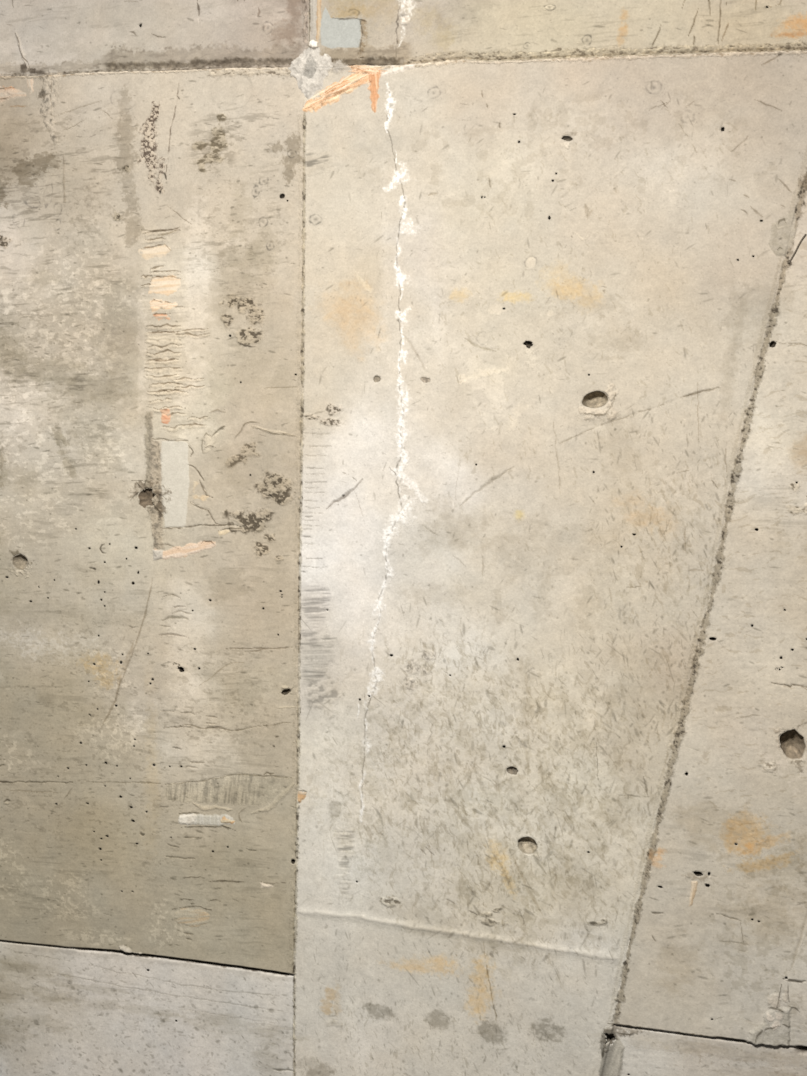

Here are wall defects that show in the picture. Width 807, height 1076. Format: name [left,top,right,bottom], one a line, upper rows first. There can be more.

crack [331,17,364,52]
crack [383,0,424,142]
leakage [286,88,446,699]
crack [379,436,430,581]
crack [356,669,389,754]